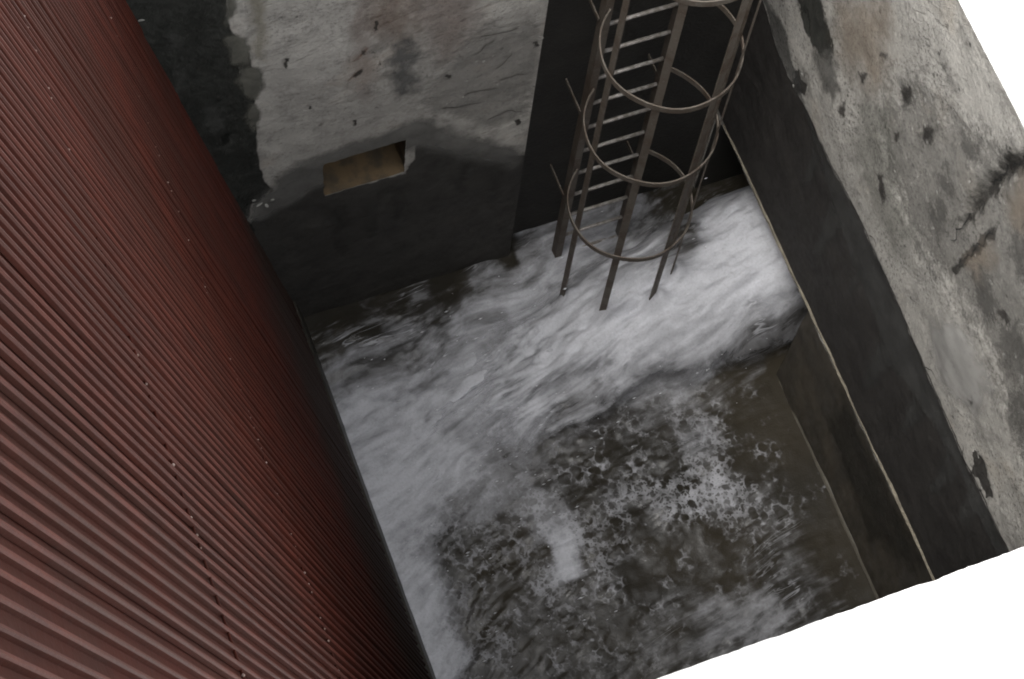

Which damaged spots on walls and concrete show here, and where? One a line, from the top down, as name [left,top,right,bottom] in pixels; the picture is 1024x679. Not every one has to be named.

damp [125,0,525,317]
damp [718,0,1009,599]